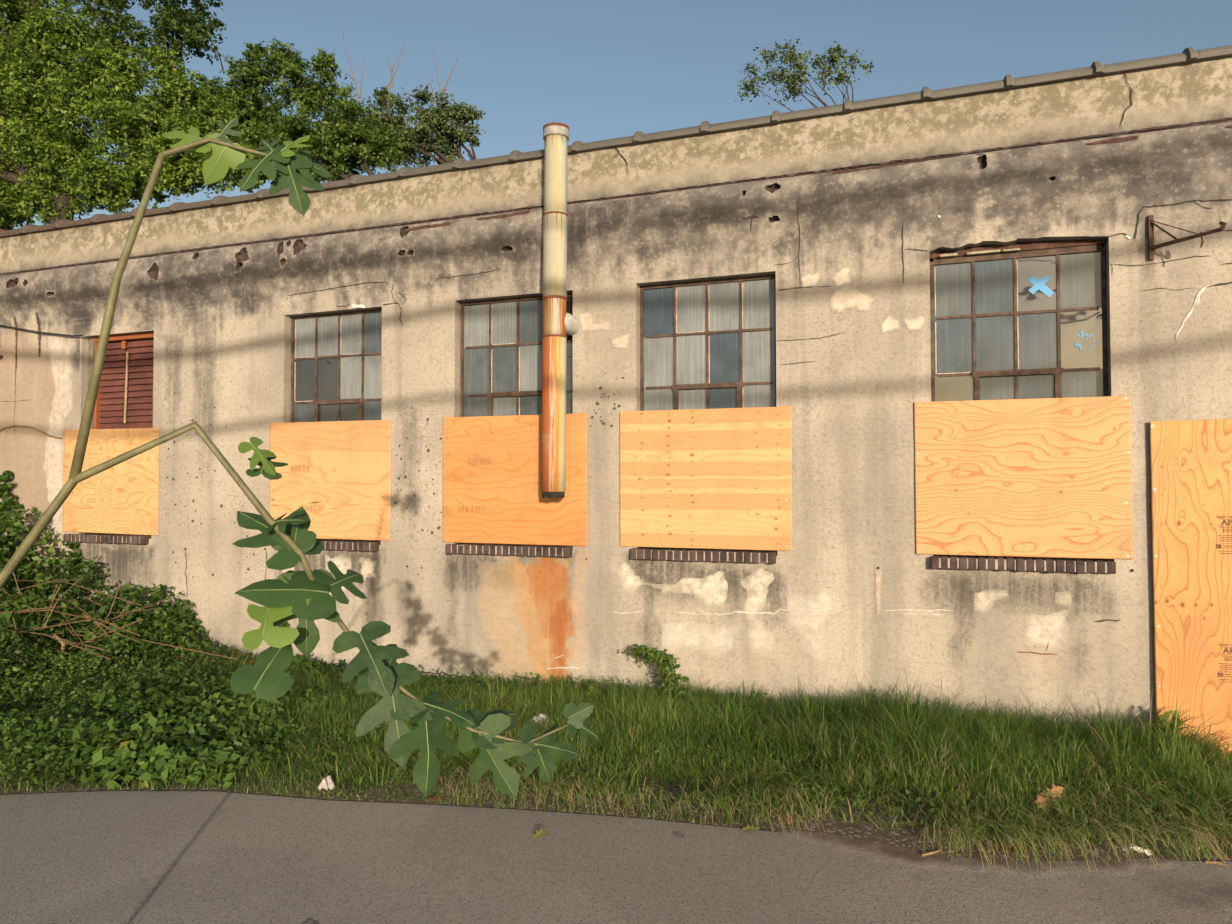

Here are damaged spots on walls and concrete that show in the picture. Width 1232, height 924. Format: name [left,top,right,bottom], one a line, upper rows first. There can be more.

spalling [3,277,28,288]
spalling [235,247,250,271]
spalling [277,239,307,265]
crack [287,282,407,324]
flaking render [398,222,451,256]
crack [0,72,1232,290]
peeling [800,266,925,335]
leakage [640,124,1232,259]
crack [1111,199,1232,339]
rust [474,546,596,689]
leakage [605,547,846,671]
leakage [911,558,1128,695]